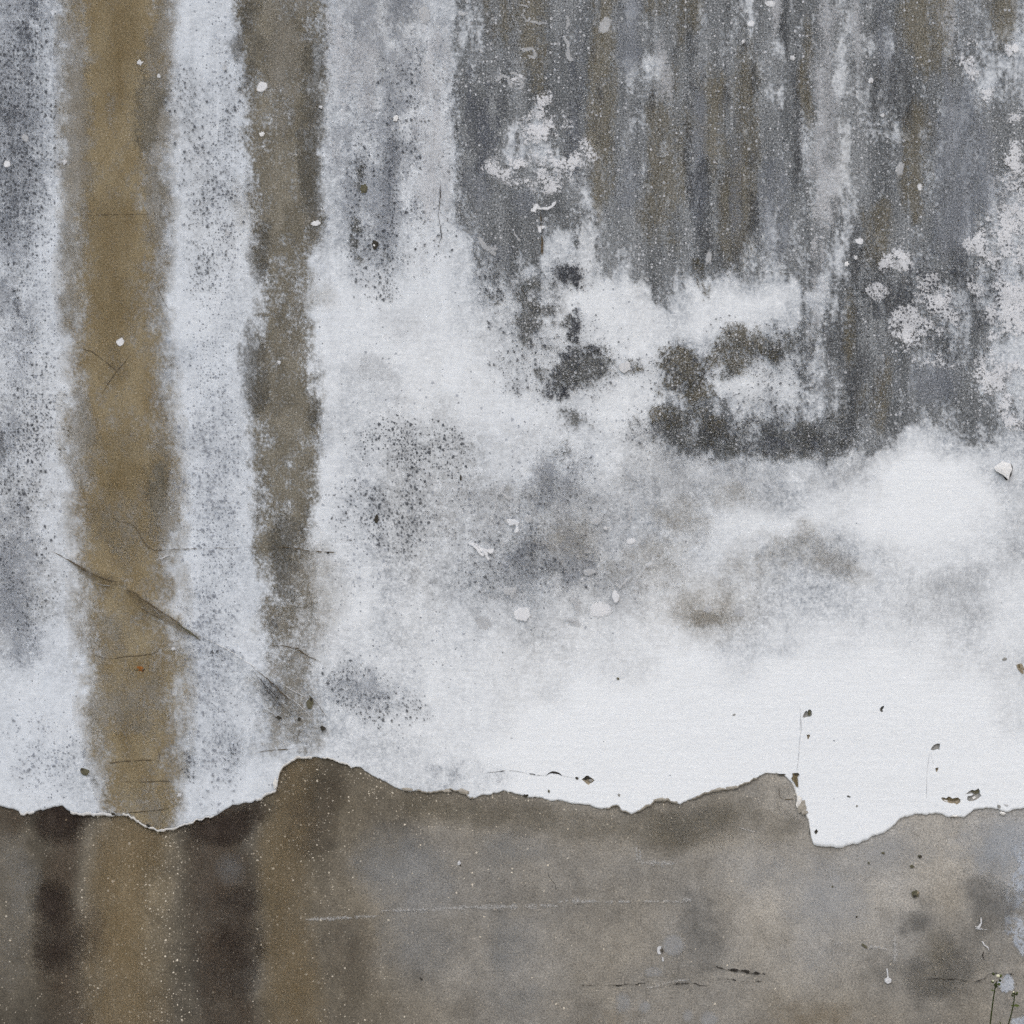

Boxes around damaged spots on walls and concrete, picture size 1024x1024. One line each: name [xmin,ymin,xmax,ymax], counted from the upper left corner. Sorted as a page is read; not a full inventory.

water stain [0,0,328,1024]
water stain [331,0,1024,599]
peeling [0,756,1024,1024]